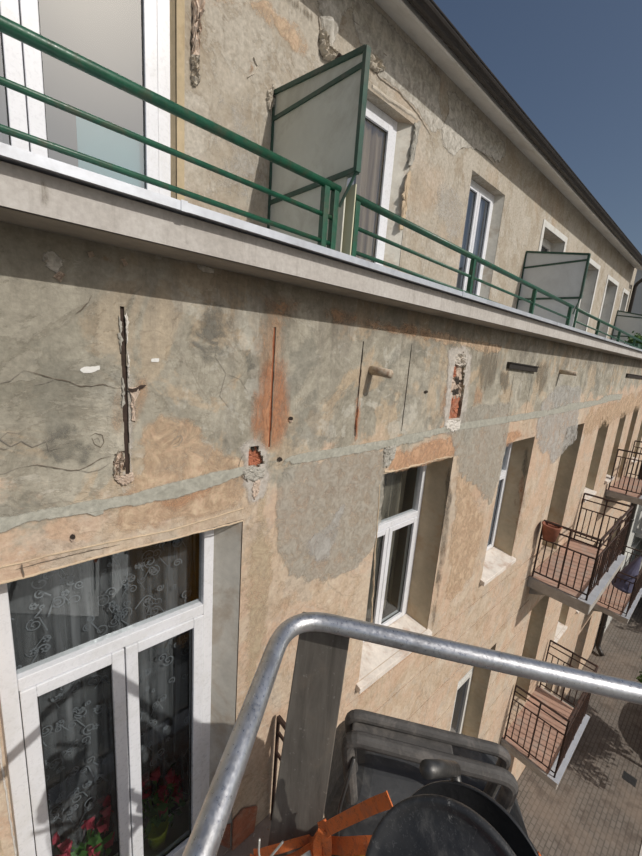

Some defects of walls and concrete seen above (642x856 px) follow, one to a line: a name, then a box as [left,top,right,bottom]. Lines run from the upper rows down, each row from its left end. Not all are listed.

flaking render [190,0,205,86]
flaking render [318,0,506,230]
crack [0,306,146,485]
rust [252,327,287,446]
flaking render [383,323,501,470]
flaking render [118,415,269,531]